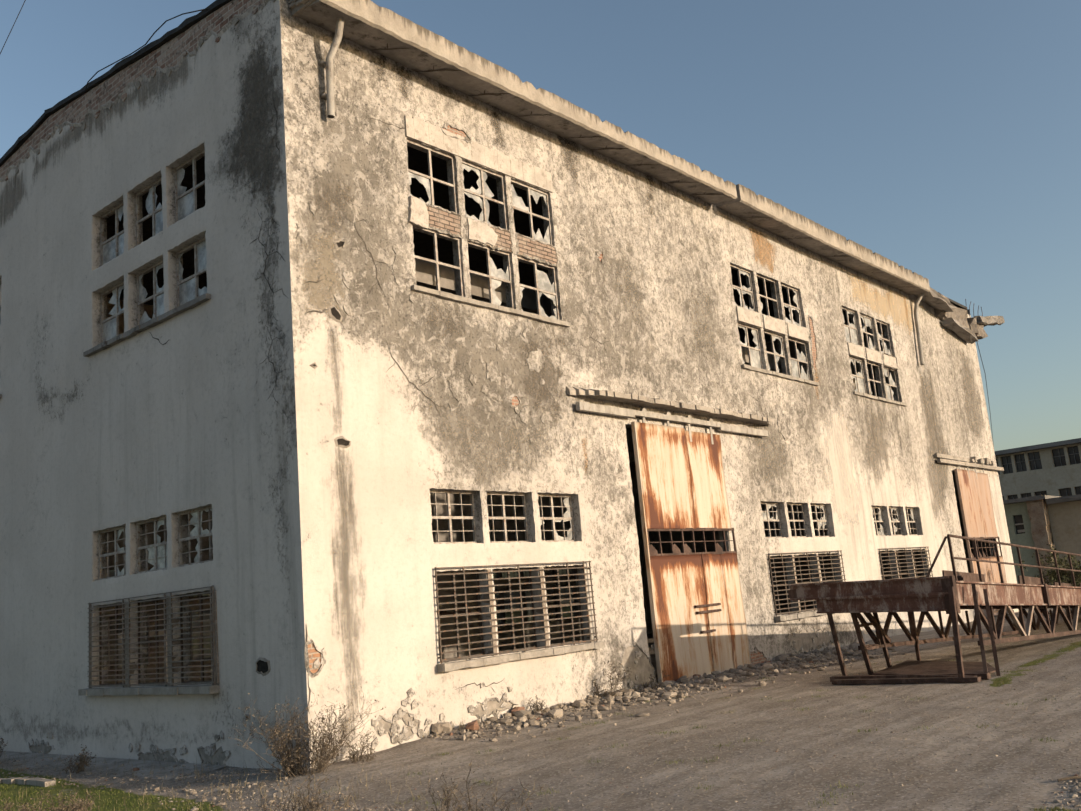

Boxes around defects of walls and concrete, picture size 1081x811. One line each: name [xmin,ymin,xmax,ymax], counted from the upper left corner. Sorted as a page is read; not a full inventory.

damp [229,45,283,213]
damp [489,112,505,148]
damp [557,135,579,179]
damp [297,185,352,317]
crack [344,215,392,304]
flaking render [426,204,559,267]
damp [521,338,565,416]
damp [962,358,983,436]
damp [920,376,946,513]
damp [335,470,357,669]
flaking render [305,639,327,678]
spalling [371,688,455,747]